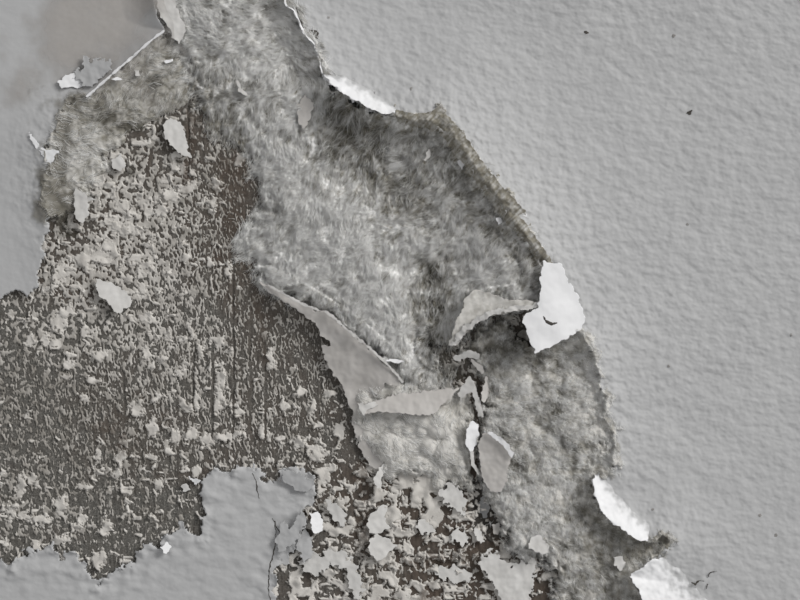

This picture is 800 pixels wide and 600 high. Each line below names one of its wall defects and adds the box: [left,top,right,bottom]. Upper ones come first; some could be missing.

peeling [284,0,397,114]
peeling [0,84,559,600]
peeling [591,473,650,542]
crack [268,518,280,600]
peeling [630,557,711,600]